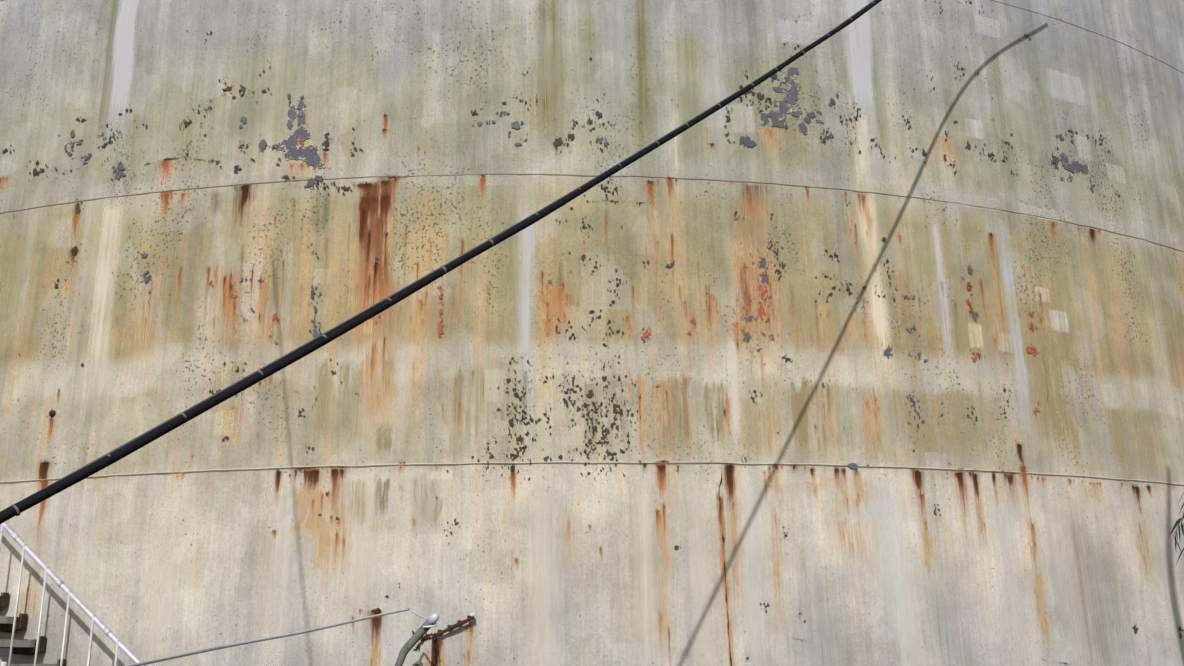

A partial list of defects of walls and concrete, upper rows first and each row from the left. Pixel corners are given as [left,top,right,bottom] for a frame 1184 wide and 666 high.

peeling [26,104,147,181]
peeling [177,60,272,165]
peeling [208,94,354,195]
peeling [724,42,896,162]
peeling [965,133,1016,174]
peeling [1051,129,1111,192]
corrosion [343,176,406,425]
corrosion [276,466,346,566]
corrosion [639,460,679,649]
corrosion [725,464,739,605]
corrosion [955,468,985,536]
corrosion [992,444,1044,505]